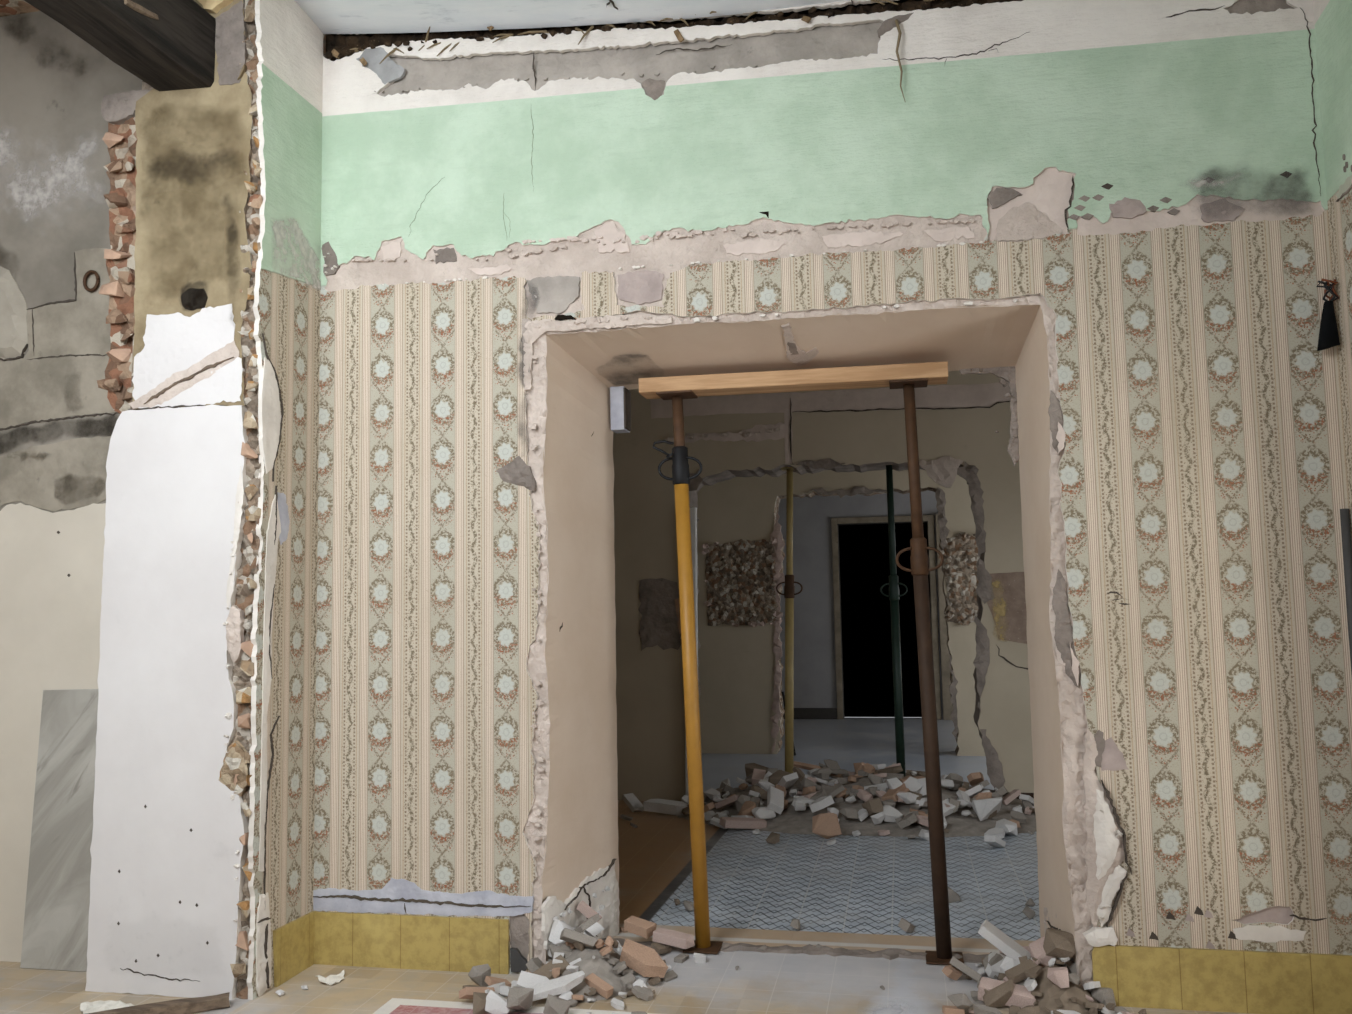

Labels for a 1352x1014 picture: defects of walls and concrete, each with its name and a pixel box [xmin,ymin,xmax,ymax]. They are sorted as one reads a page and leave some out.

peeling [323,4,929,100]
crack [883,32,1028,62]
crack [1168,5,1225,17]
crack [1301,9,1321,195]
flaking render [0,436,111,512]
flaking render [215,0,290,999]
flaking render [313,154,1352,992]